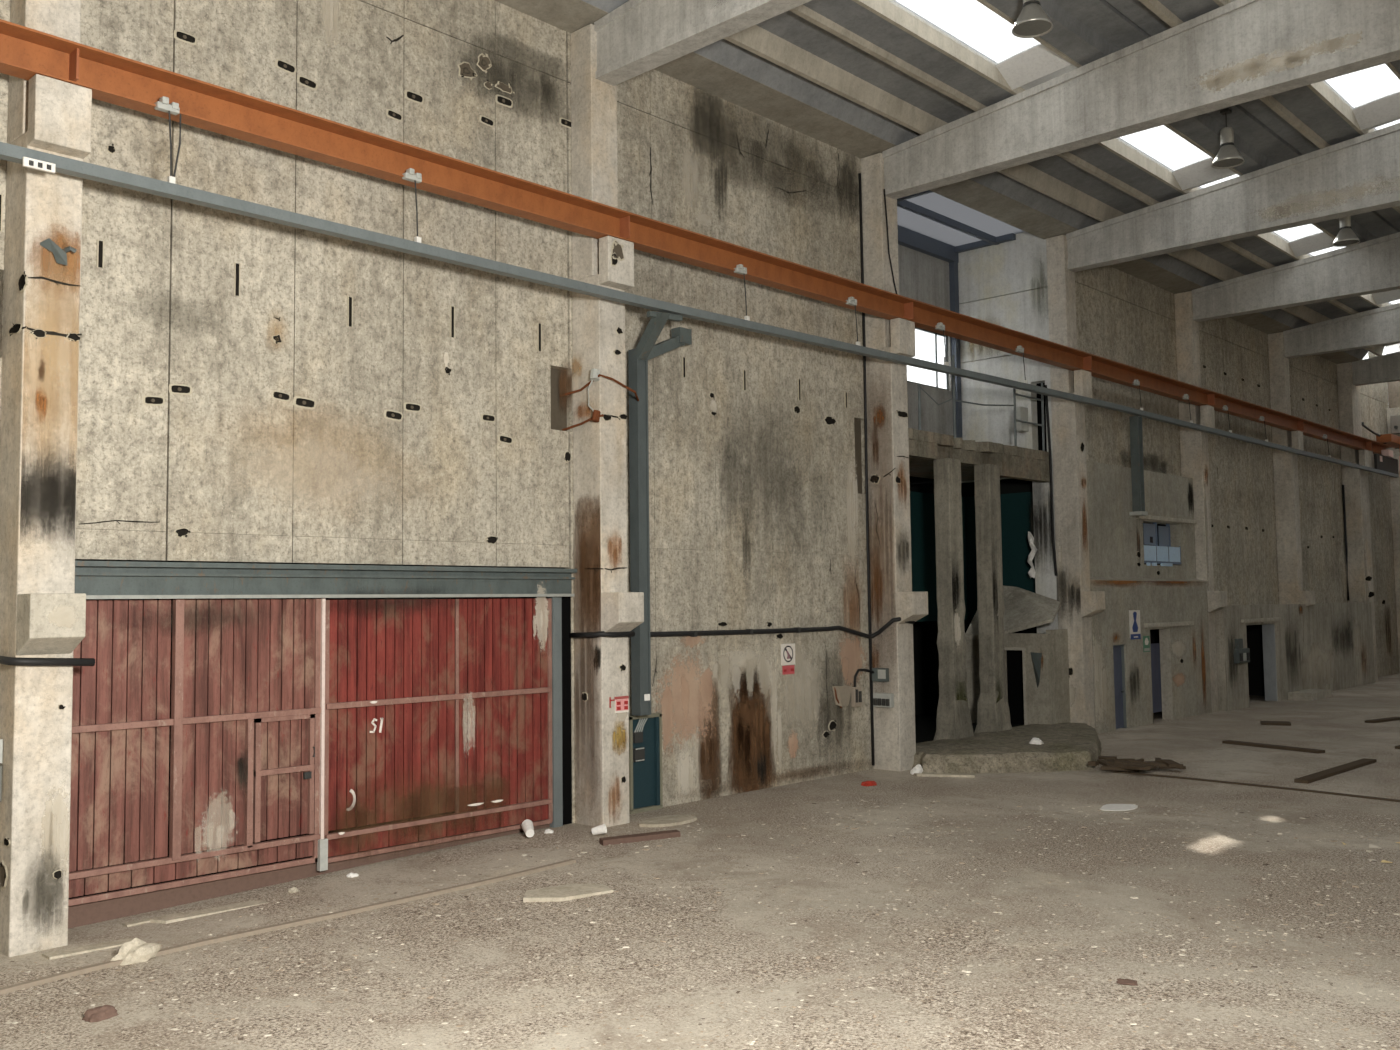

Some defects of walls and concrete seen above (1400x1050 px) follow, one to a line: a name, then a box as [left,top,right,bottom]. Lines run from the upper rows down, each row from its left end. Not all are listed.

corrosion [34,232,81,285]
crack [28,276,80,286]
crack [10,324,82,341]
corrosion [36,393,46,415]
leakage [43,475,76,527]
leakage [699,671,774,799]
leakage [35,866,57,905]